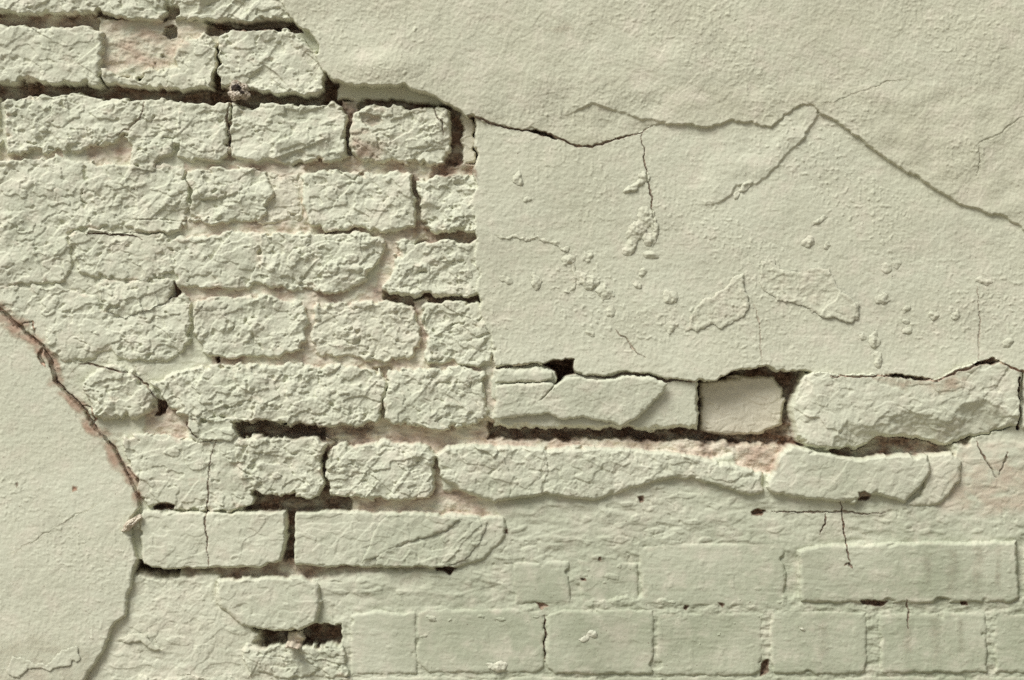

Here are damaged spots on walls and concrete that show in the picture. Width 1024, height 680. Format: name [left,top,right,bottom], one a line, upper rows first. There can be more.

peeling [130,138,174,172]
crack [467,115,653,209]
crack [967,116,1024,177]
peeling [100,278,177,319]
crack [84,362,157,399]
flaking render [494,366,667,427]
peeling [187,418,242,441]
crack [6,504,96,556]
peeling [362,510,487,569]
crack [764,501,886,568]
peeling [6,646,81,678]